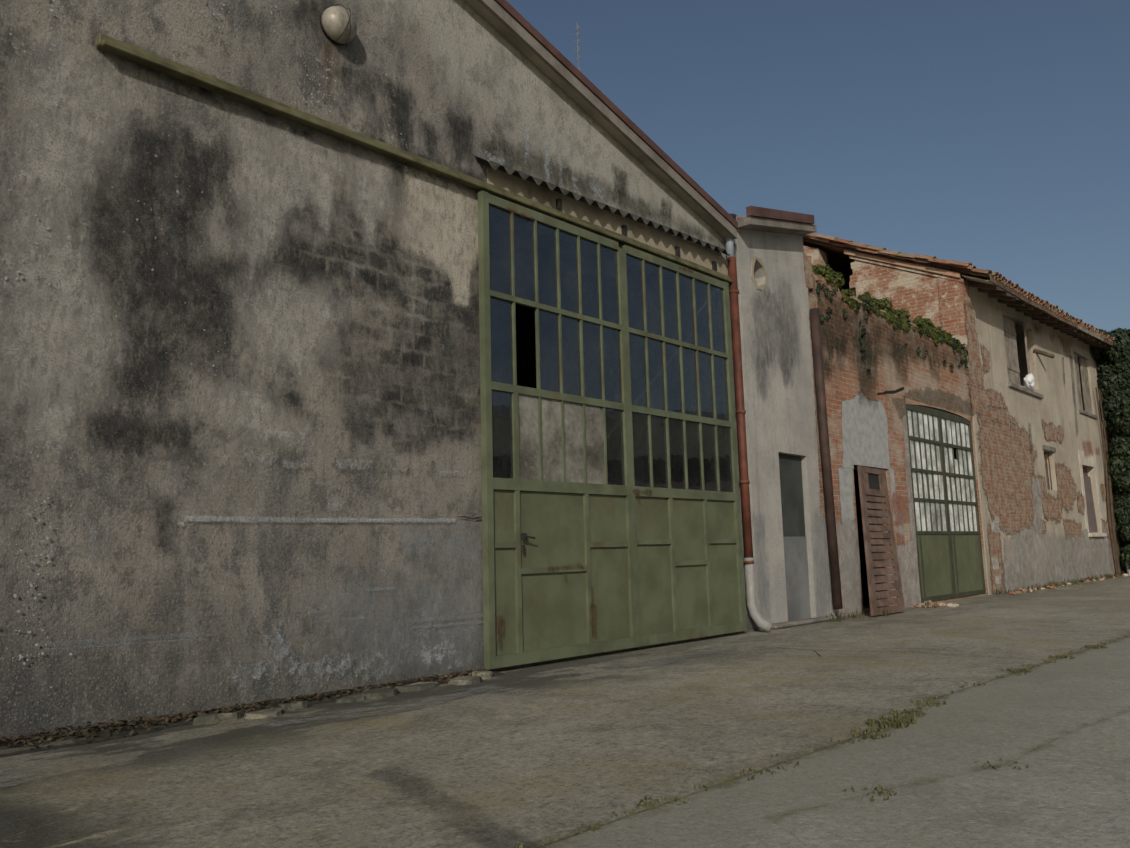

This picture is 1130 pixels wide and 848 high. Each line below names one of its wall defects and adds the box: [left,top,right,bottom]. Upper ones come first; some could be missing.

leakage [1,0,666,455]
peeling [889,468,897,522]
flaking render [964,300,1115,594]